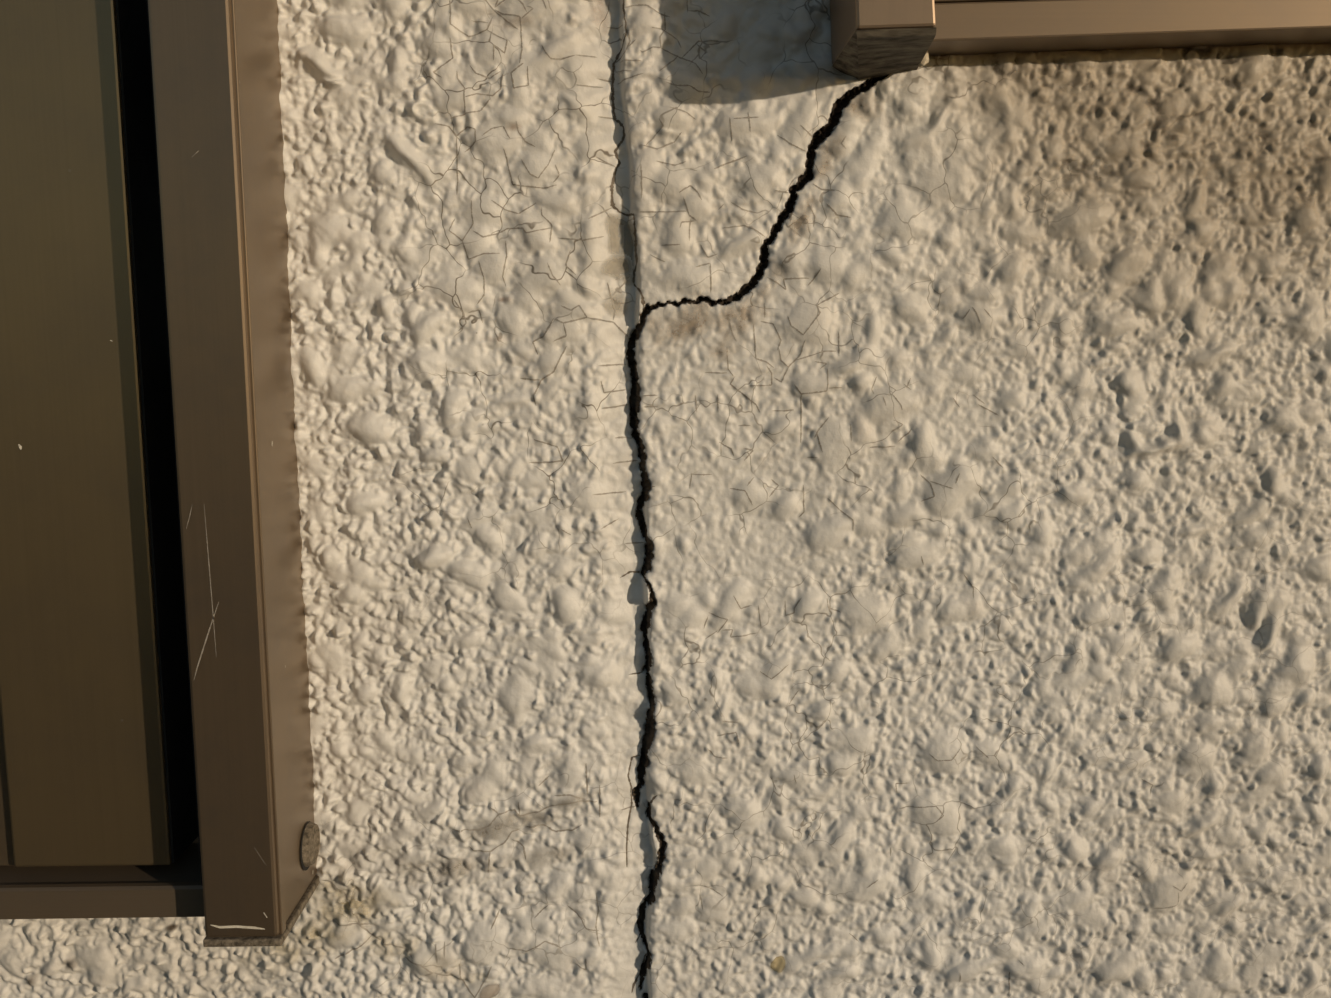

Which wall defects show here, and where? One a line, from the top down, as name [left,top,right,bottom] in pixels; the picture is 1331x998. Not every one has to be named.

crack [953,395,998,415]
crack [433,0,912,998]
crack [921,473,960,502]
crack [896,783,944,820]
crack [322,880,600,998]